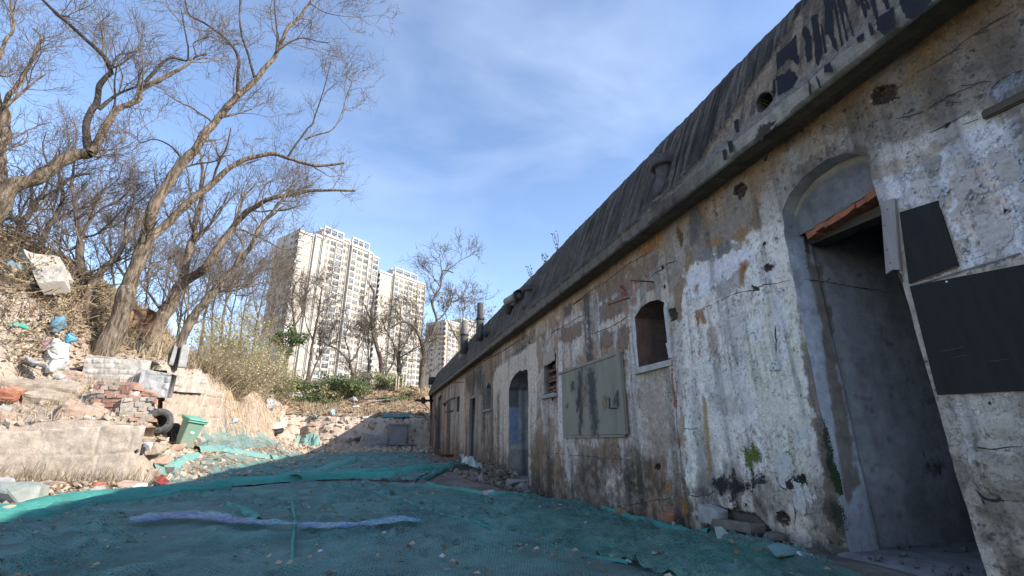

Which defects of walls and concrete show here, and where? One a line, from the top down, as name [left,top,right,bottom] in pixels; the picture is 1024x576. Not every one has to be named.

crack [888,9,1022,133]
spalling [869,84,898,106]
spalling [733,182,747,200]
crack [692,278,890,313]
damp [577,293,599,438]
crack [978,444,1022,452]
damp [687,468,766,511]
damp [779,474,808,491]
crack [975,489,1007,504]